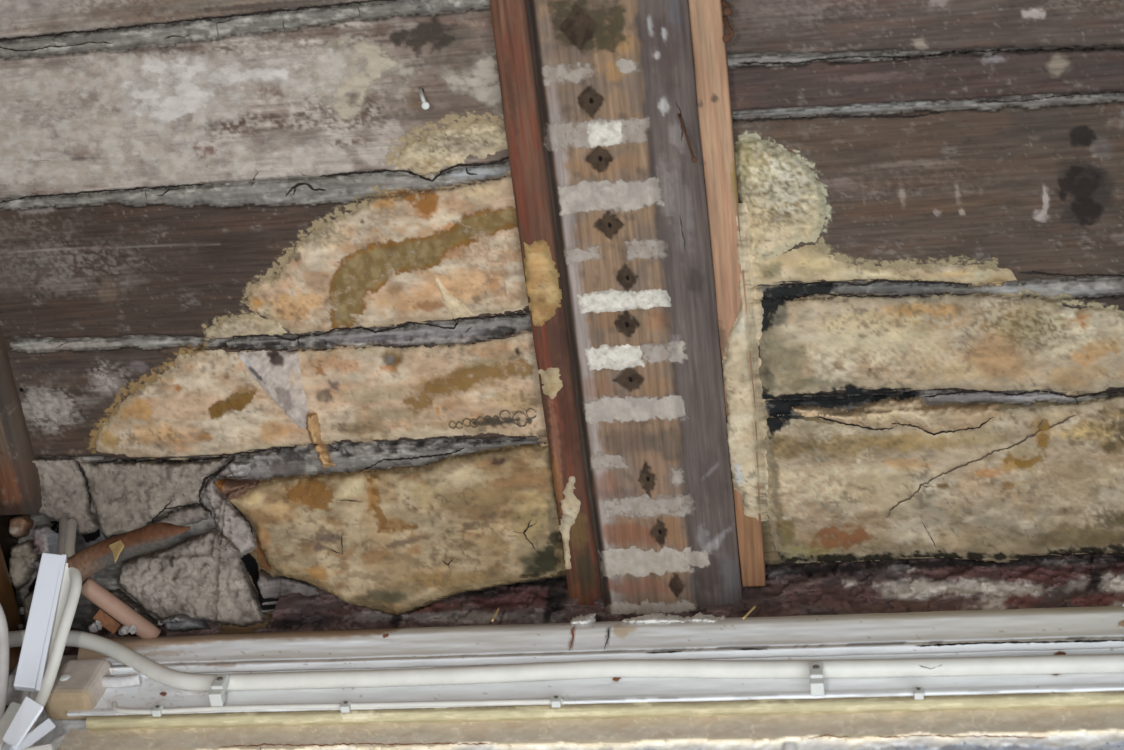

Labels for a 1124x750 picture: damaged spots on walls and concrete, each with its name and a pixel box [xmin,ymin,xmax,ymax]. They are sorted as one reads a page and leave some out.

damp [1070,126,1095,146]
damp [1059,167,1102,225]
crack [815,388,1124,547]
peeling [109,540,124,563]